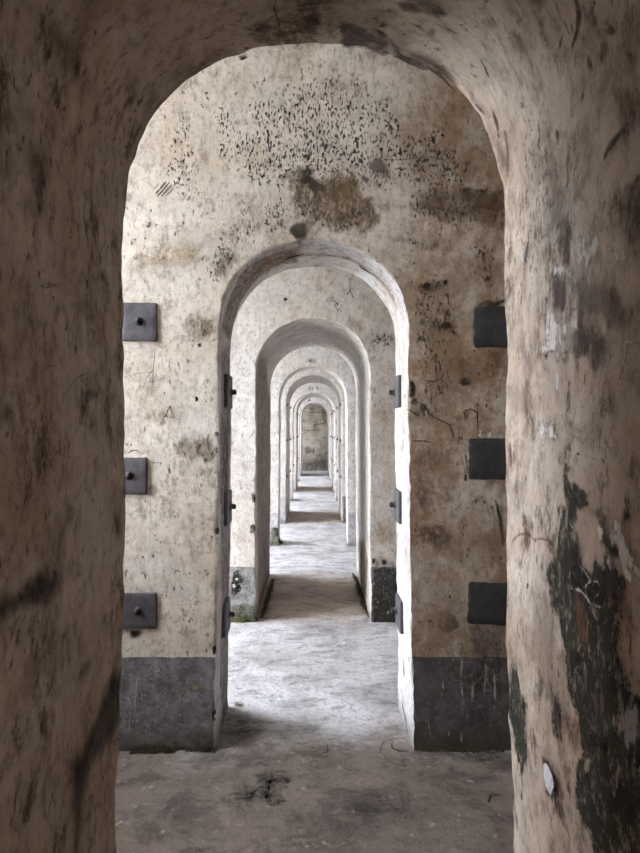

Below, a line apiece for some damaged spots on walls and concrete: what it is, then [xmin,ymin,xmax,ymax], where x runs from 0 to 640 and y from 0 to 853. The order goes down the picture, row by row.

water stain [160,114,202,201]
water stain [206,68,503,288]
water stain [546,462,640,853]